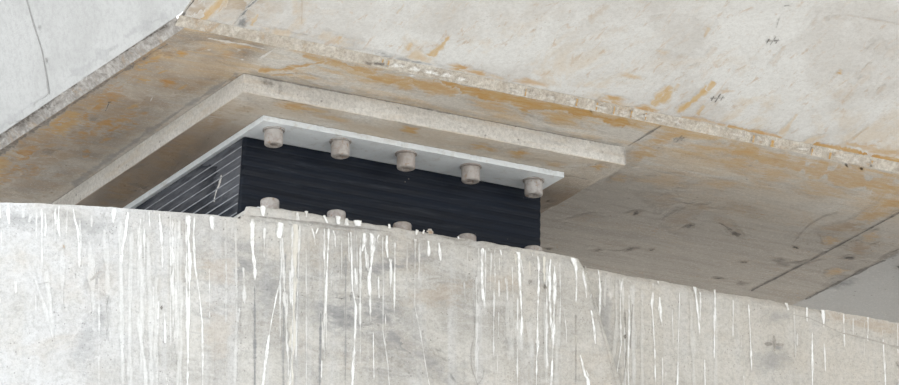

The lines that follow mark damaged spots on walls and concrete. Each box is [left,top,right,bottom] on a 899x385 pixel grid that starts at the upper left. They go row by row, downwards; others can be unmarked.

rust [181,0,307,39]
water stain [0,42,169,156]
rust [0,31,899,228]
water stain [0,204,590,385]
water stain [571,258,719,385]
water stain [732,300,808,378]
water stain [811,333,826,385]